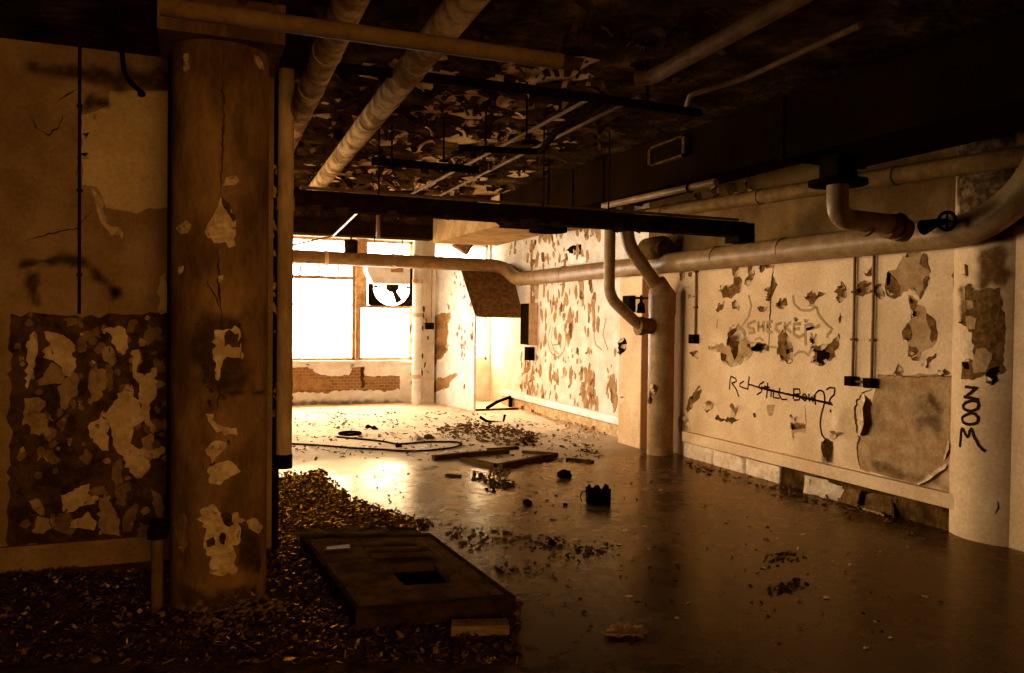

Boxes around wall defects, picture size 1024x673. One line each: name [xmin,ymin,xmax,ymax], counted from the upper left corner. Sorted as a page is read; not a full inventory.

peeling [81,90,168,238]
peeling [5,265,263,606]
crack [206,243,223,319]
peeling [205,175,239,248]
crack [219,47,227,195]
peeling [294,41,399,190]
peeling [292,272,474,394]
peeling [327,0,696,200]
peeling [519,280,627,430]
peeling [678,385,739,432]
peeling [690,264,793,367]
peeling [805,251,1005,485]